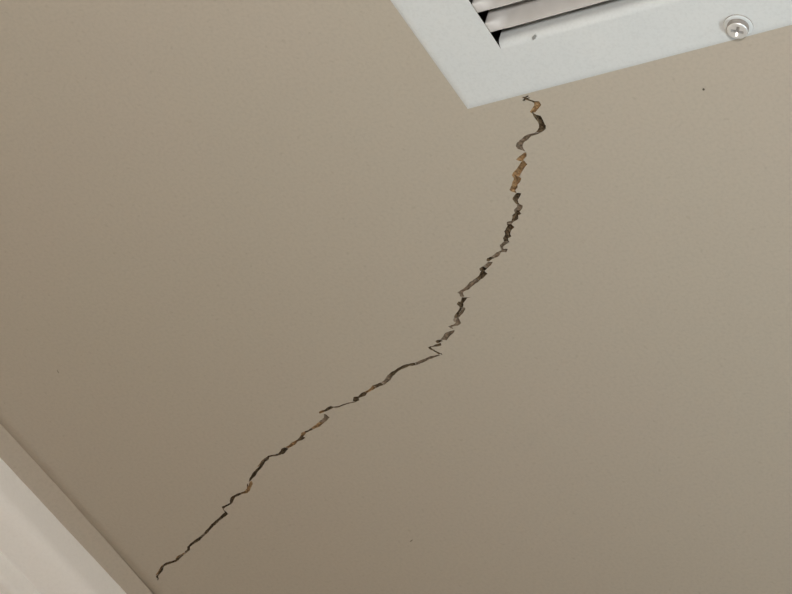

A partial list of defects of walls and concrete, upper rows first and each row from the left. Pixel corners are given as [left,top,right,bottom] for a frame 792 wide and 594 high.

crack [156,96,546,580]